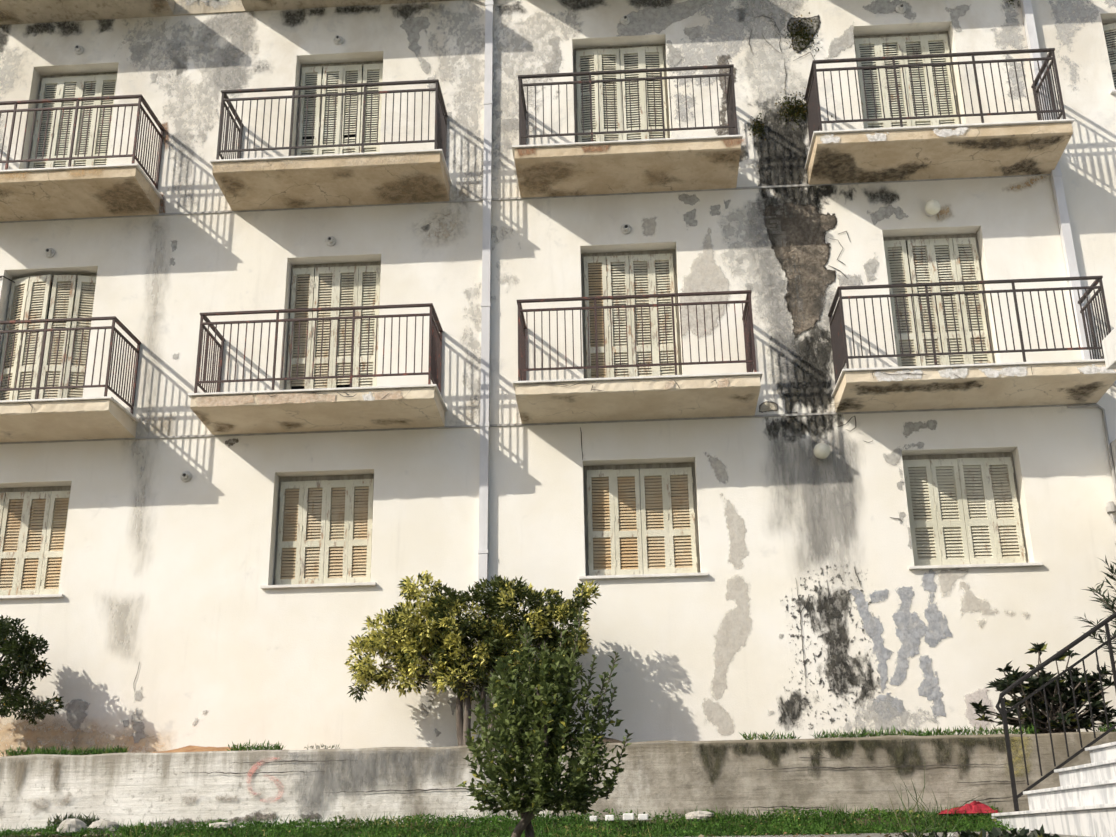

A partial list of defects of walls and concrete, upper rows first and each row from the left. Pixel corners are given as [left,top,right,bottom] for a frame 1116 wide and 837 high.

leakage [99,0,268,207]
leakage [282,0,604,202]
leakage [630,0,672,8]
peeling [617,0,747,136]
spalling [787,15,821,53]
peeling [825,25,854,60]
leakage [949,135,1070,175]
leakage [699,0,1015,783]
leakage [1069,382,1100,401]
peeling [703,453,752,735]
peeling [849,569,1028,721]
peeling [965,688,995,729]